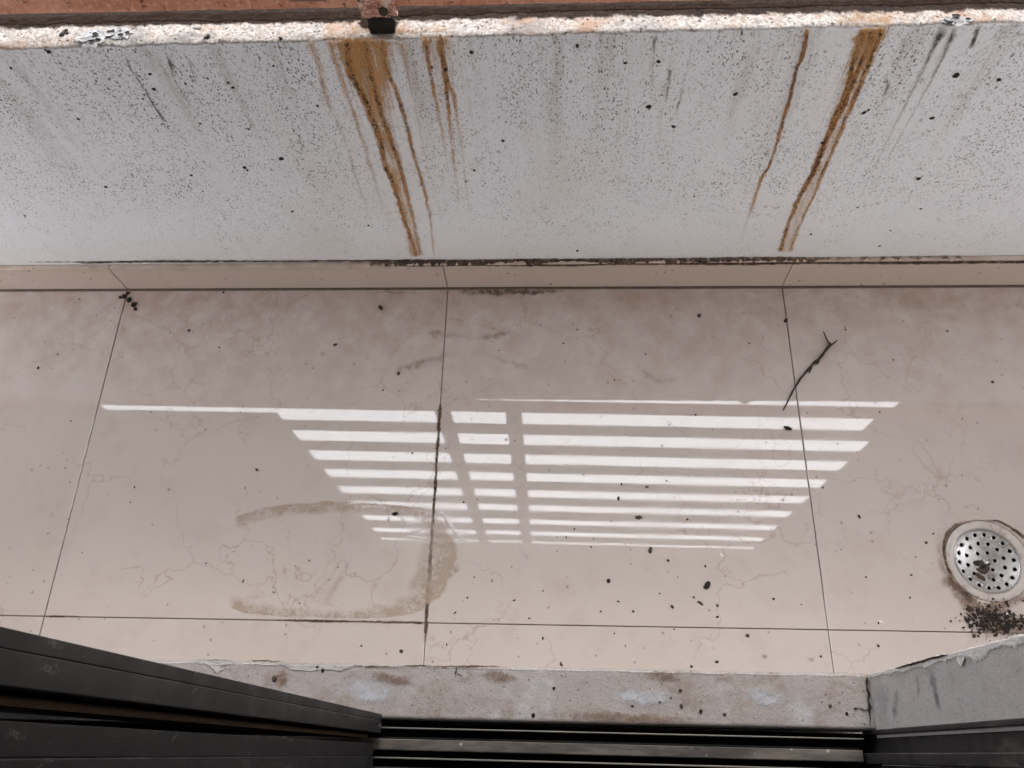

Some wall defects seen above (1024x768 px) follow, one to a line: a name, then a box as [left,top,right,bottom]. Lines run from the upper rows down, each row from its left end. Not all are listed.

corrosion [308,27,433,257]
corrosion [422,29,457,161]
corrosion [750,29,809,213]
corrosion [778,14,888,251]
water stain [233,501,458,618]